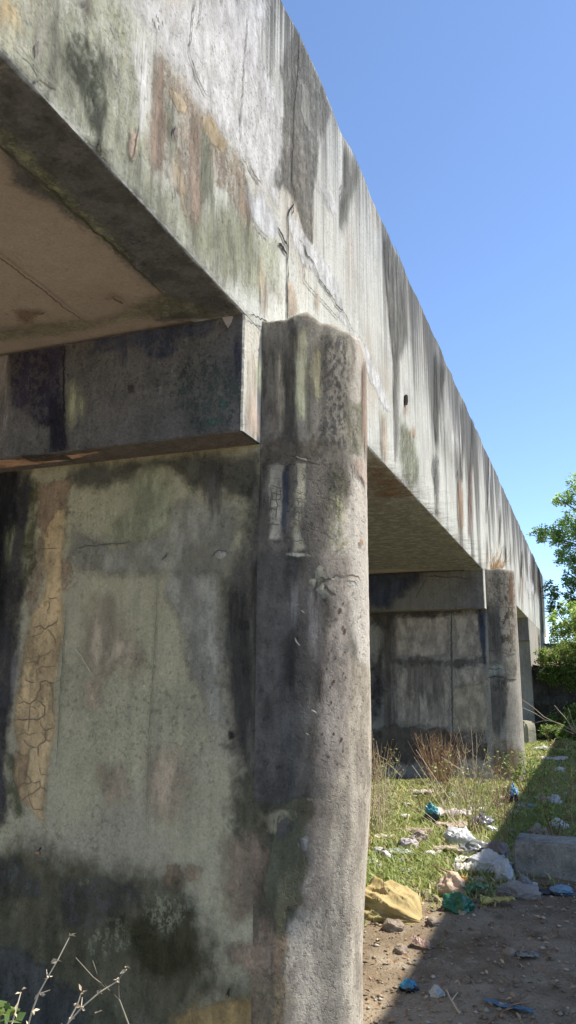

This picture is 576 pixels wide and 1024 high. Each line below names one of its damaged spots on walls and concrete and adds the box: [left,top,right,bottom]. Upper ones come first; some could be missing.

water stain [0,0,359,360]
crack [15,590,92,810]
water stain [0,238,517,1024]
water stain [499,516,545,632]